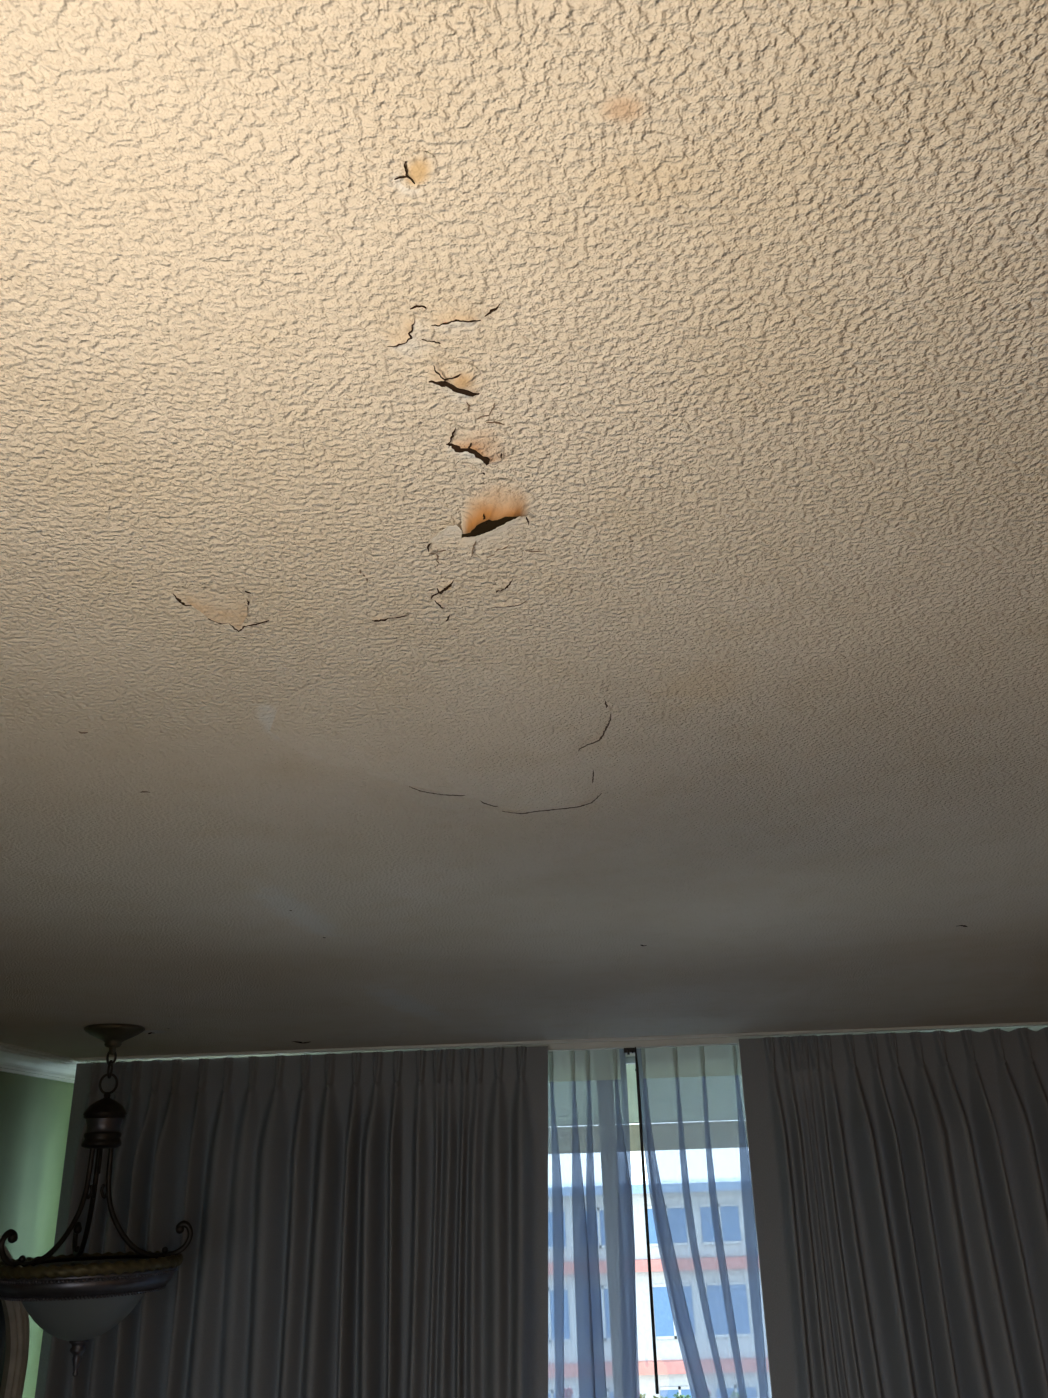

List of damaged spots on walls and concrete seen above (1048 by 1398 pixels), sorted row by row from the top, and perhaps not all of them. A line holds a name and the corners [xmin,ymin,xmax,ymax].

peeling [377,300,500,406]
peeling [445,423,520,475]
peeling [429,525,462,549]
crack [404,701,631,815]